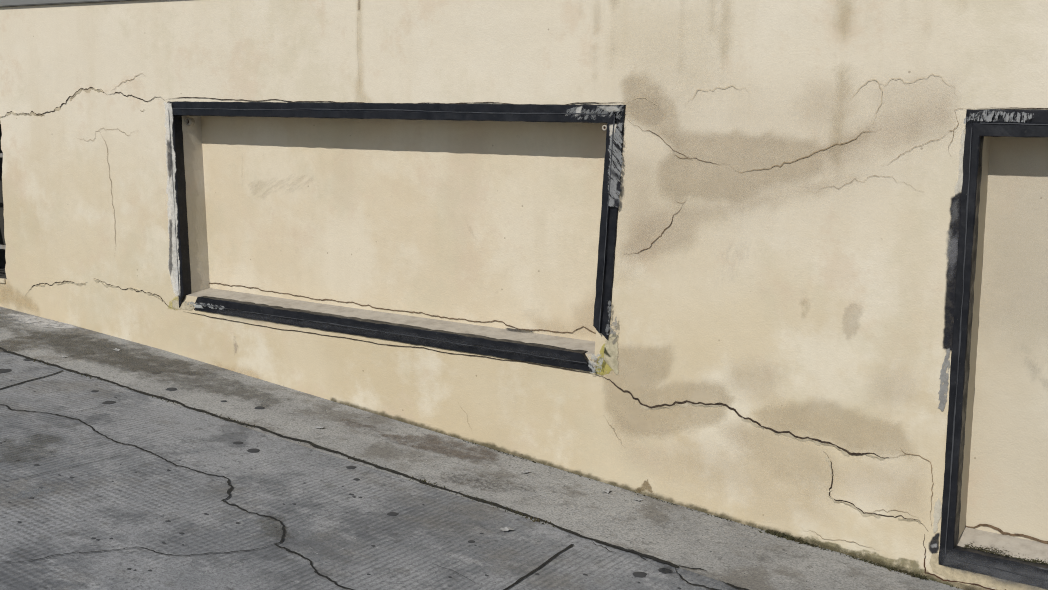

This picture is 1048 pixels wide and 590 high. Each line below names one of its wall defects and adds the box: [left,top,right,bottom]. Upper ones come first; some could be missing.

crack [0,20,364,257]
crack [398,99,510,107]
crack [565,102,879,173]
crack [819,107,1048,190]
leakage [948,239,957,265]
spalling [587,300,618,374]
leakage [596,344,613,375]
crack [26,279,1006,590]
crack [966,524,1048,544]